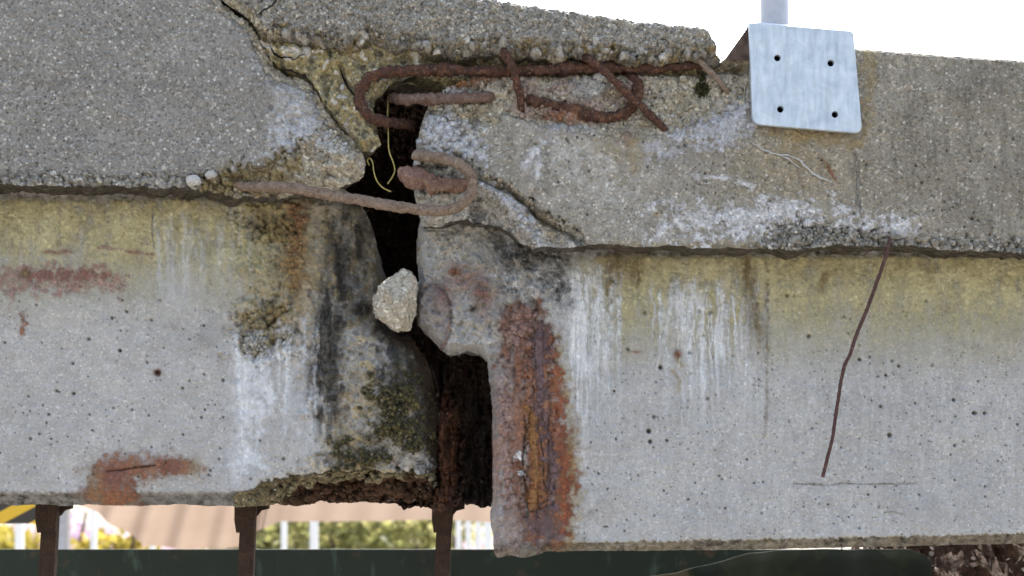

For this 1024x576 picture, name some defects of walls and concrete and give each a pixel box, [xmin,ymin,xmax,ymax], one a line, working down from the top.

water stain [416,105,488,167]
spalling [423,60,749,145]
spalling [414,157,586,249]
rust [0,250,129,299]
water stain [300,204,439,474]
water stain [481,181,1024,410]
efflorescence [230,325,294,479]
rust [84,452,205,506]
spalling [233,464,441,508]
rust [434,392,464,514]